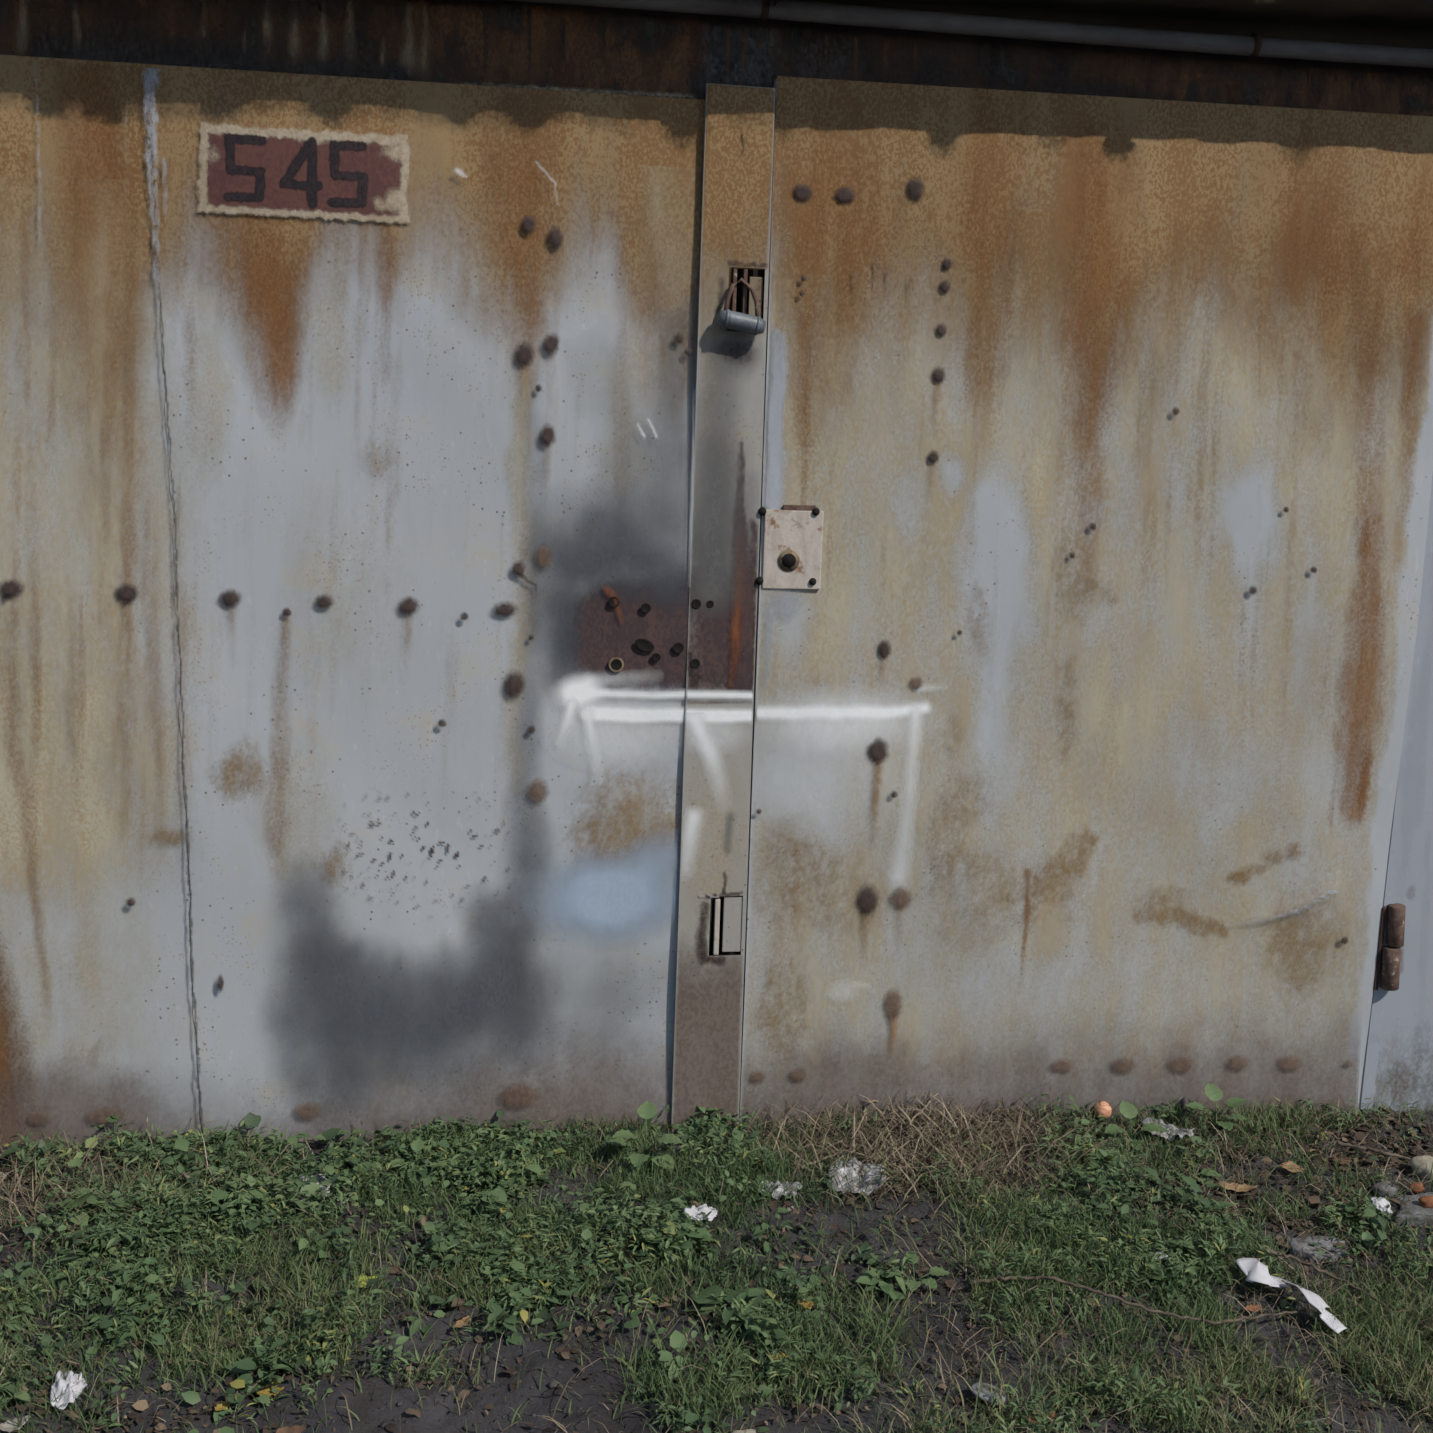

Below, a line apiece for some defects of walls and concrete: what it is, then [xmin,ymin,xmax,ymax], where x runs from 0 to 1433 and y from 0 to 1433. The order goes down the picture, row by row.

corrosion [0,55,1433,471]
corrosion [728,442,757,699]
corrosion [0,580,23,601]
corrosion [116,584,138,604]
corrosion [220,590,240,606]
corrosion [399,597,419,613]
corrosion [494,602,515,616]
corrosion [879,641,891,658]
corrosion [505,673,525,697]
corrosion [868,739,897,813]
corrosion [296,873,1358,1145]
corrosion [0,971,156,1149]